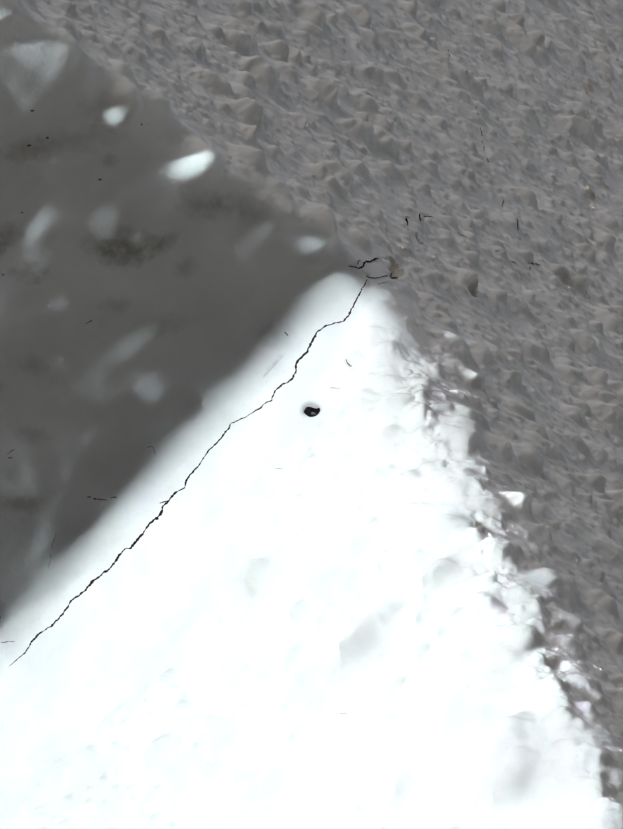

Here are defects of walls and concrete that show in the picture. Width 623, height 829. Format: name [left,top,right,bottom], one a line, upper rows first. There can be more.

crack [1,258,388,665]